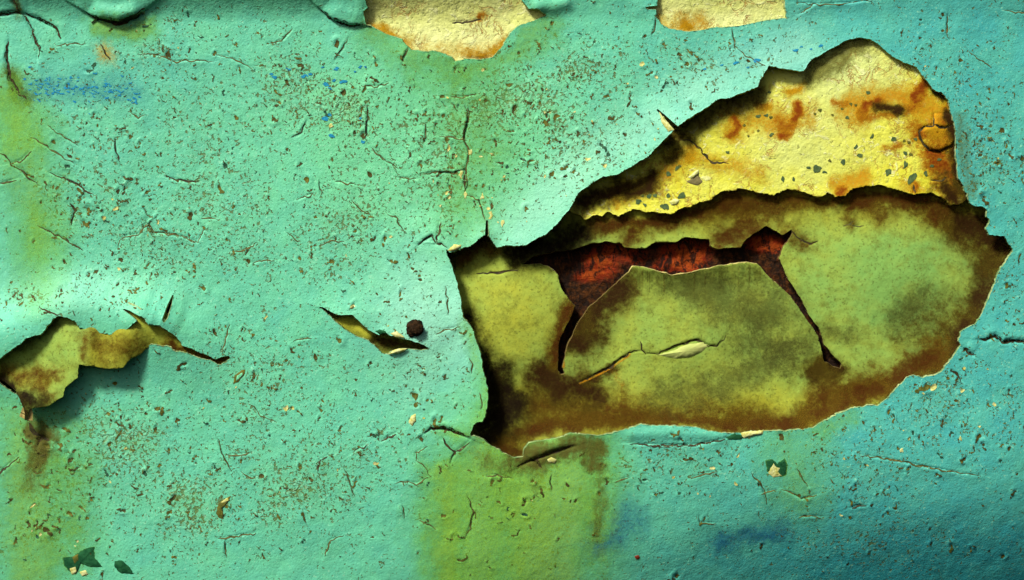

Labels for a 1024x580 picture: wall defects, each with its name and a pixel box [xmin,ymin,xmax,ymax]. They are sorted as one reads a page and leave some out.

crack [0,0,145,100]
corrosion [368,23,412,47]
crack [363,83,485,220]
crack [118,209,215,245]
peeling [0,85,370,577]
crack [298,179,446,247]
peeling [130,0,1024,530]
corrosion [437,38,1011,580]
crack [950,335,1024,384]
crack [397,426,470,529]
crack [465,497,475,537]
spalling [475,478,555,553]